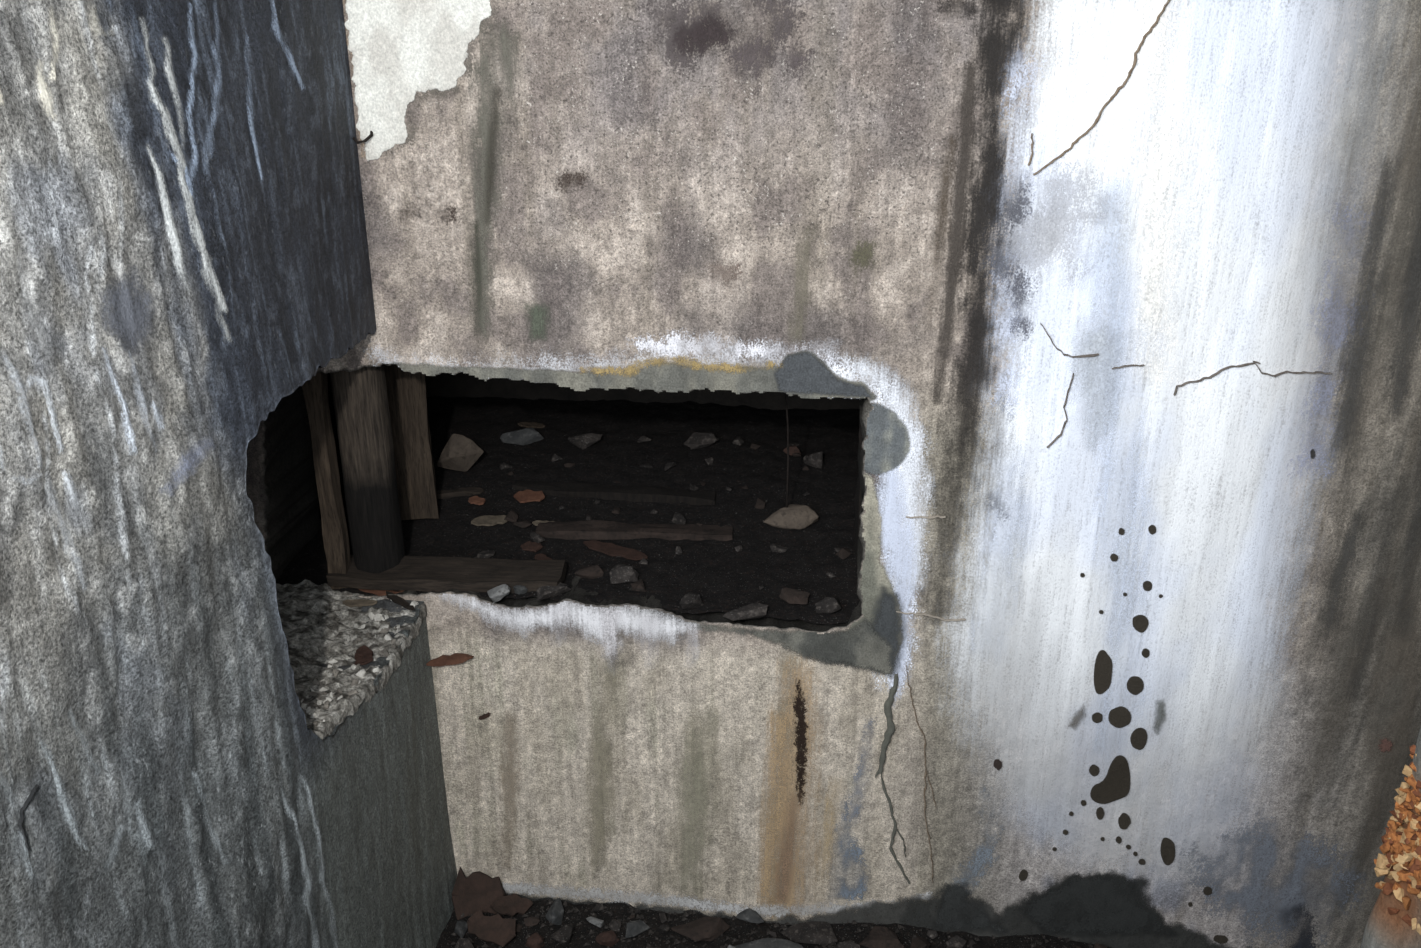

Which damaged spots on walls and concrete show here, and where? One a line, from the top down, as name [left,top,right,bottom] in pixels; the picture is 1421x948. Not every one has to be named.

flaking render [343,0,497,161]
crack [1028,0,1170,175]
spalling [390,350,910,675]
damp [443,0,1392,948]
crack [1041,324,1145,448]
crack [1173,361,1332,396]
corrosion [760,660,819,917]
crack [875,664,936,884]